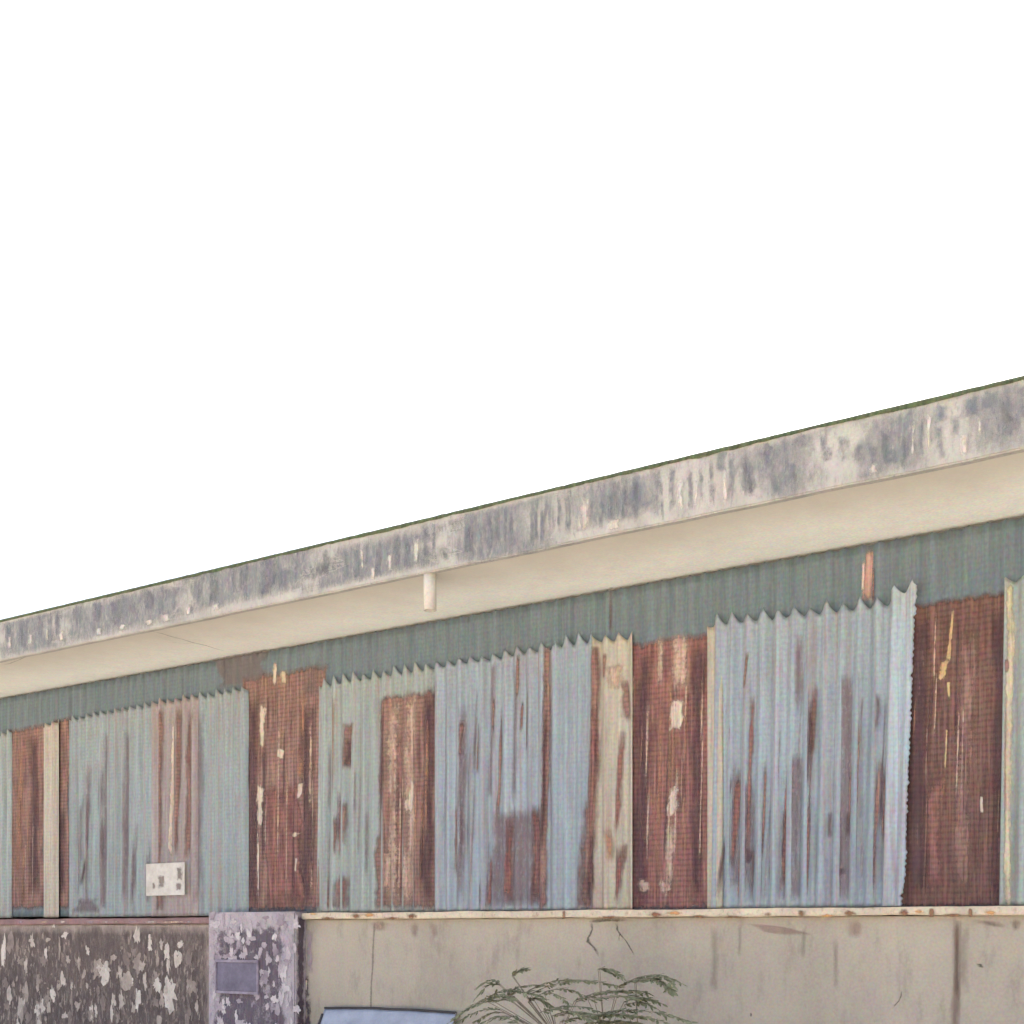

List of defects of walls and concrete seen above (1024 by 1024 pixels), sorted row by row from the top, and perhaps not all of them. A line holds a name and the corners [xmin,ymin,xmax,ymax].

water stain [2,530,434,654]
water stain [455,471,674,558]
water stain [689,436,803,498]
water stain [857,410,922,469]
rust [10,718,107,911]
rust [158,711,200,876]
rust [243,649,551,919]
rust [577,634,817,918]
rust [828,682,885,893]
rust [900,585,1015,917]
peeling [0,911,312,1024]
crack [587,919,632,951]